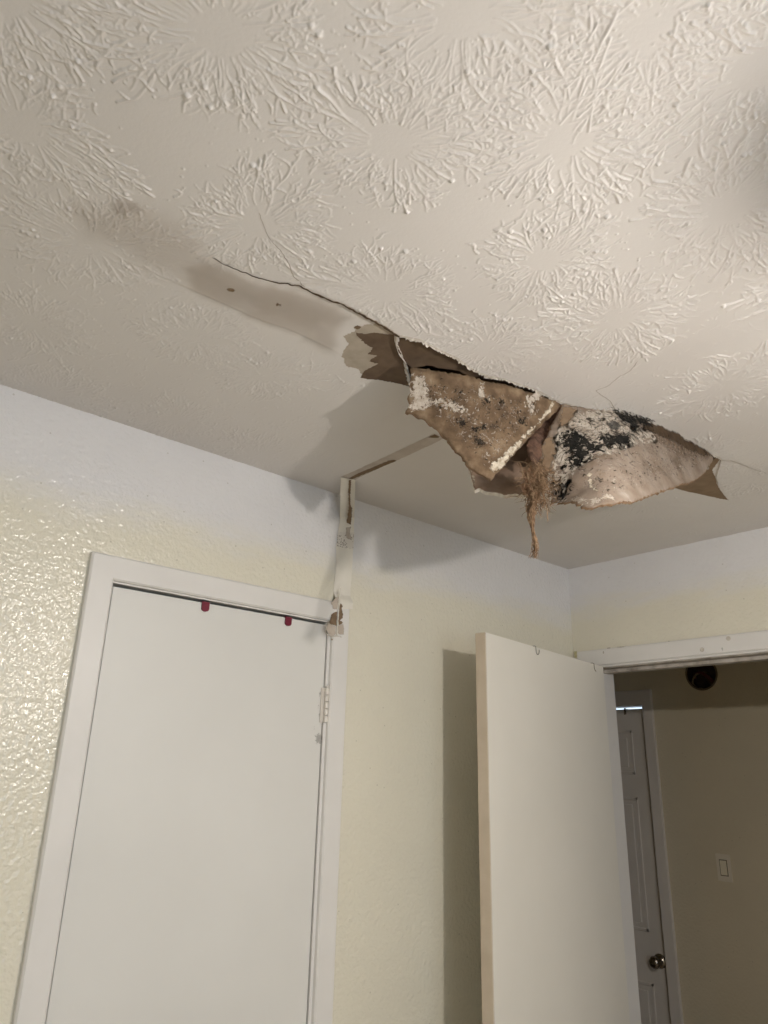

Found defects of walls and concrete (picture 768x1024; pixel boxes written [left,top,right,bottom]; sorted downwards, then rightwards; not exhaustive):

crack [213,214,400,337]
spalling [397,345,561,405]
damp [551,409,712,503]
peeling [325,434,443,640]